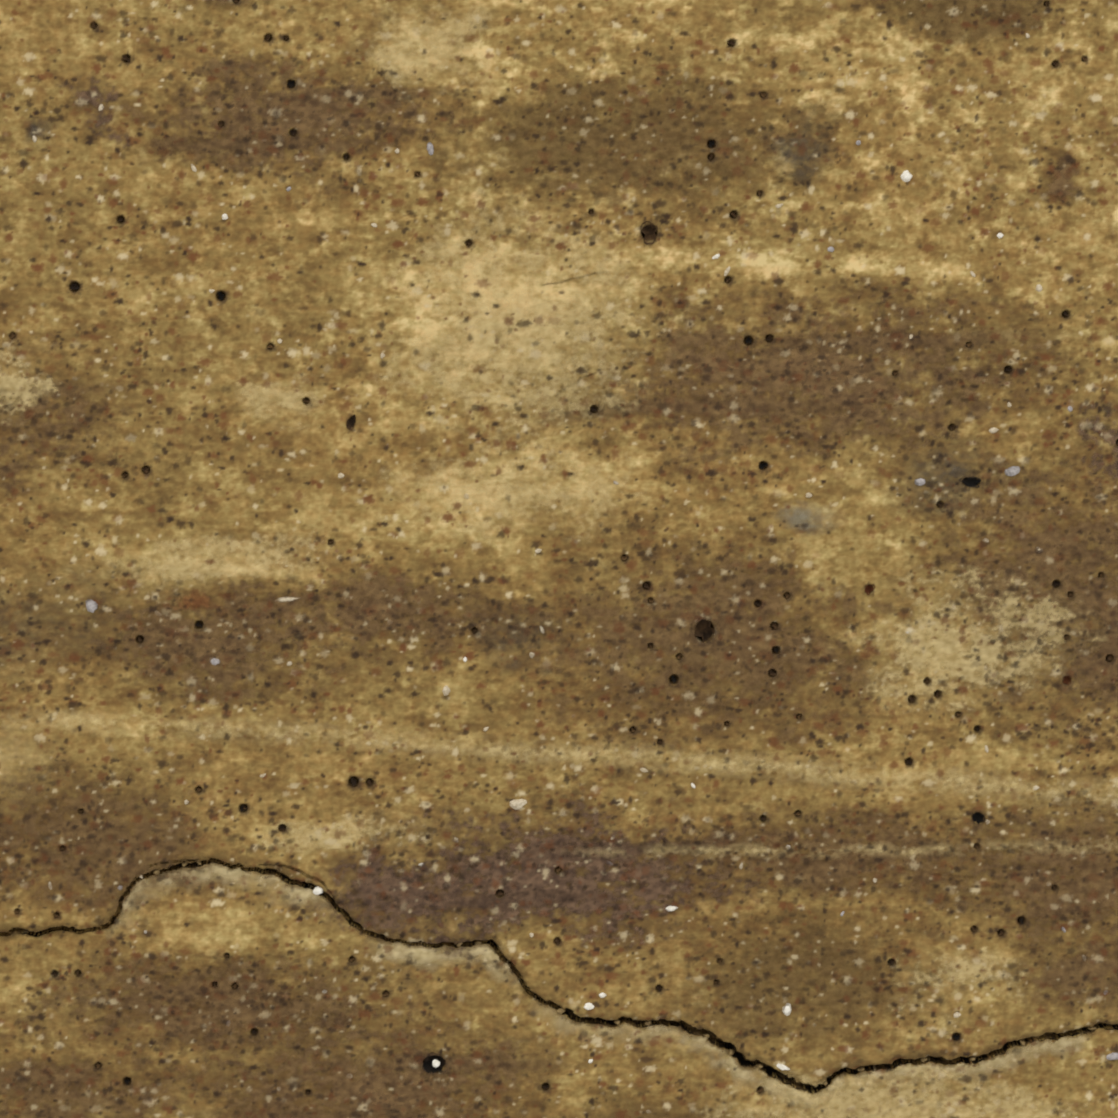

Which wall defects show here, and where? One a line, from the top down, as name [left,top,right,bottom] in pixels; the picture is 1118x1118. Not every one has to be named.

crack [0,858,1118,1105]